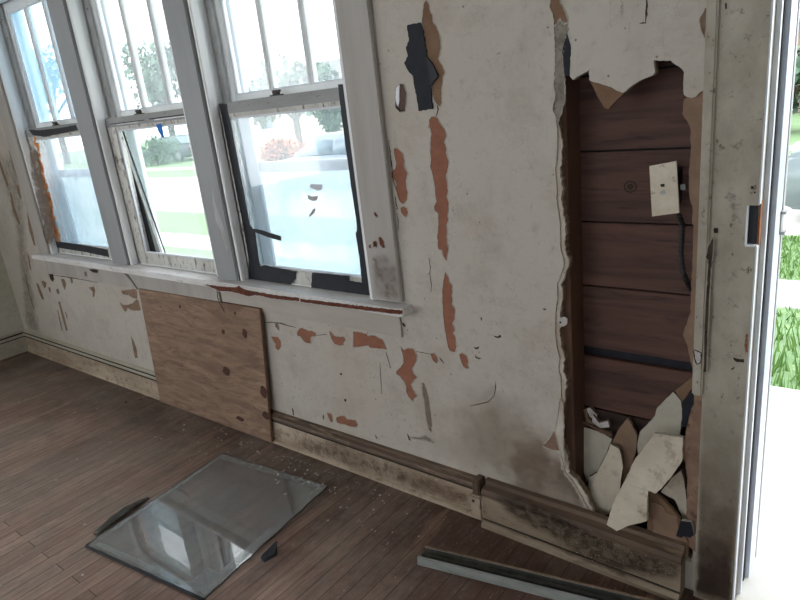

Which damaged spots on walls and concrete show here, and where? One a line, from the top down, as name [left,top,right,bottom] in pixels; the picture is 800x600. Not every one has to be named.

peeling [422,0,446,107]
flaking render [548,0,569,125]
peeling [391,147,409,218]
peeling [428,116,450,261]
peeling [204,284,406,327]
peeling [296,327,317,344]
peeling [329,331,388,350]
peeling [396,346,418,402]
peeling [441,272,481,369]
flaking render [554,398,566,469]
water stain [505,499,675,575]
water stain [697,561,729,599]